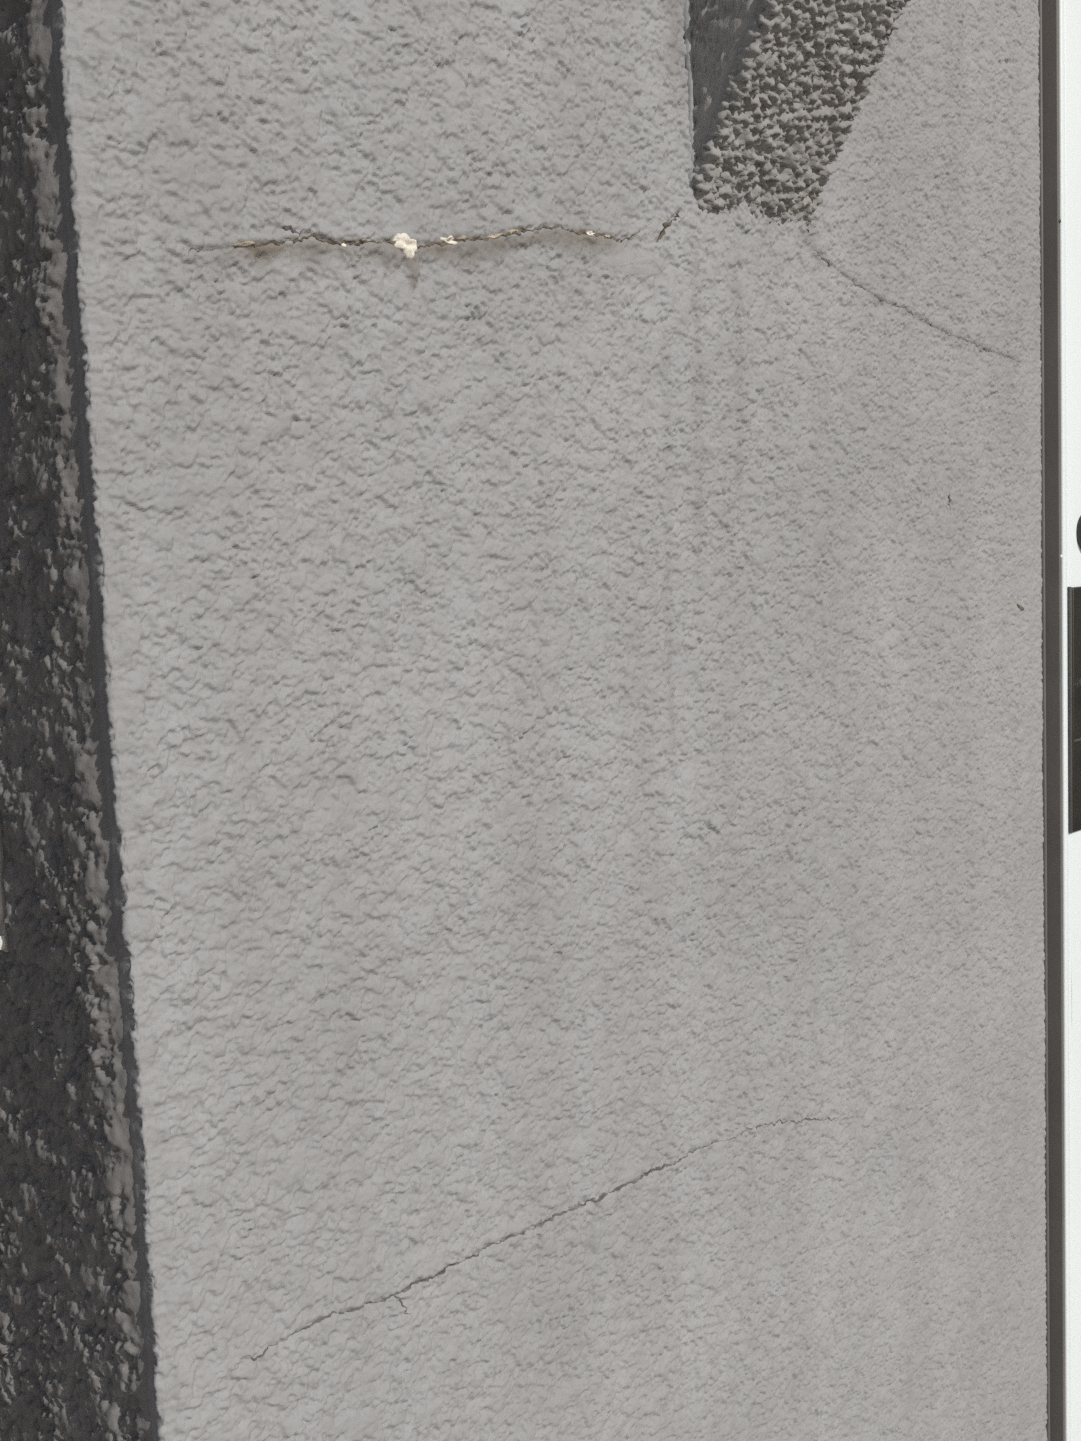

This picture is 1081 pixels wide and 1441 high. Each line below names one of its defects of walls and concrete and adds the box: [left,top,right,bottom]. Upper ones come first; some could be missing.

crack [168,211,680,255]
crack [241,1117,844,1361]